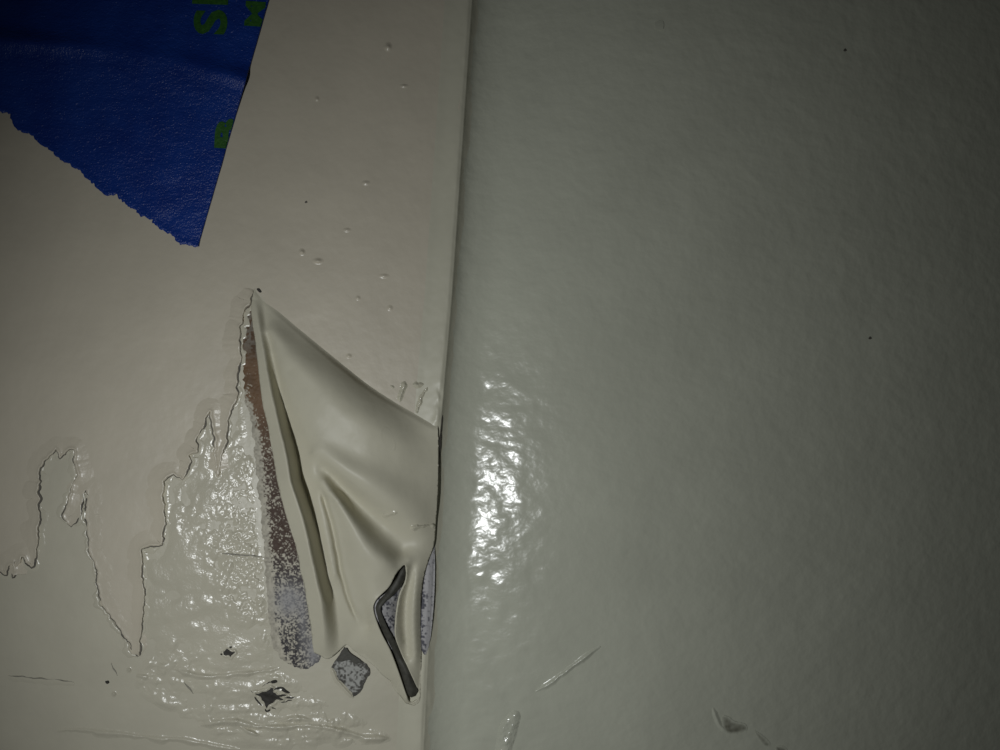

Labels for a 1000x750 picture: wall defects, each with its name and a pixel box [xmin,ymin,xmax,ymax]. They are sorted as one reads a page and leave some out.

peeling [134,288,439,750]